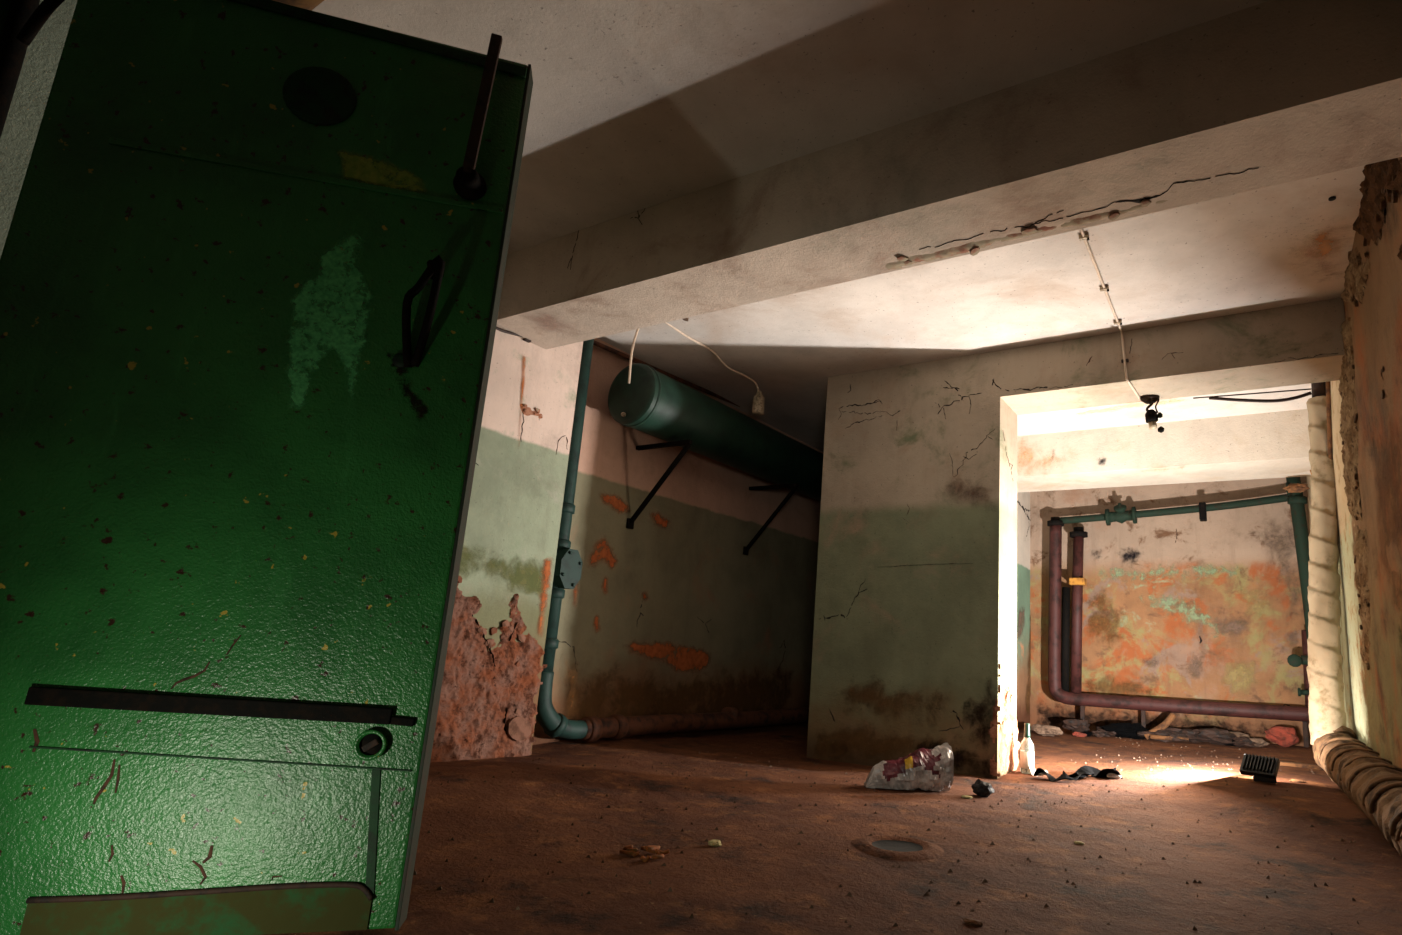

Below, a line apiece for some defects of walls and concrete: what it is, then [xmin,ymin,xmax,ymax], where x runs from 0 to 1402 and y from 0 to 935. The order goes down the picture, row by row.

crack [919,167,1259,250]
crack [839,384,899,431]
crack [938,357,1092,537]
spalling [1338,157,1402,670]
spalling [430,576,548,763]
peeling [630,642,710,671]
leakage [815,687,996,776]